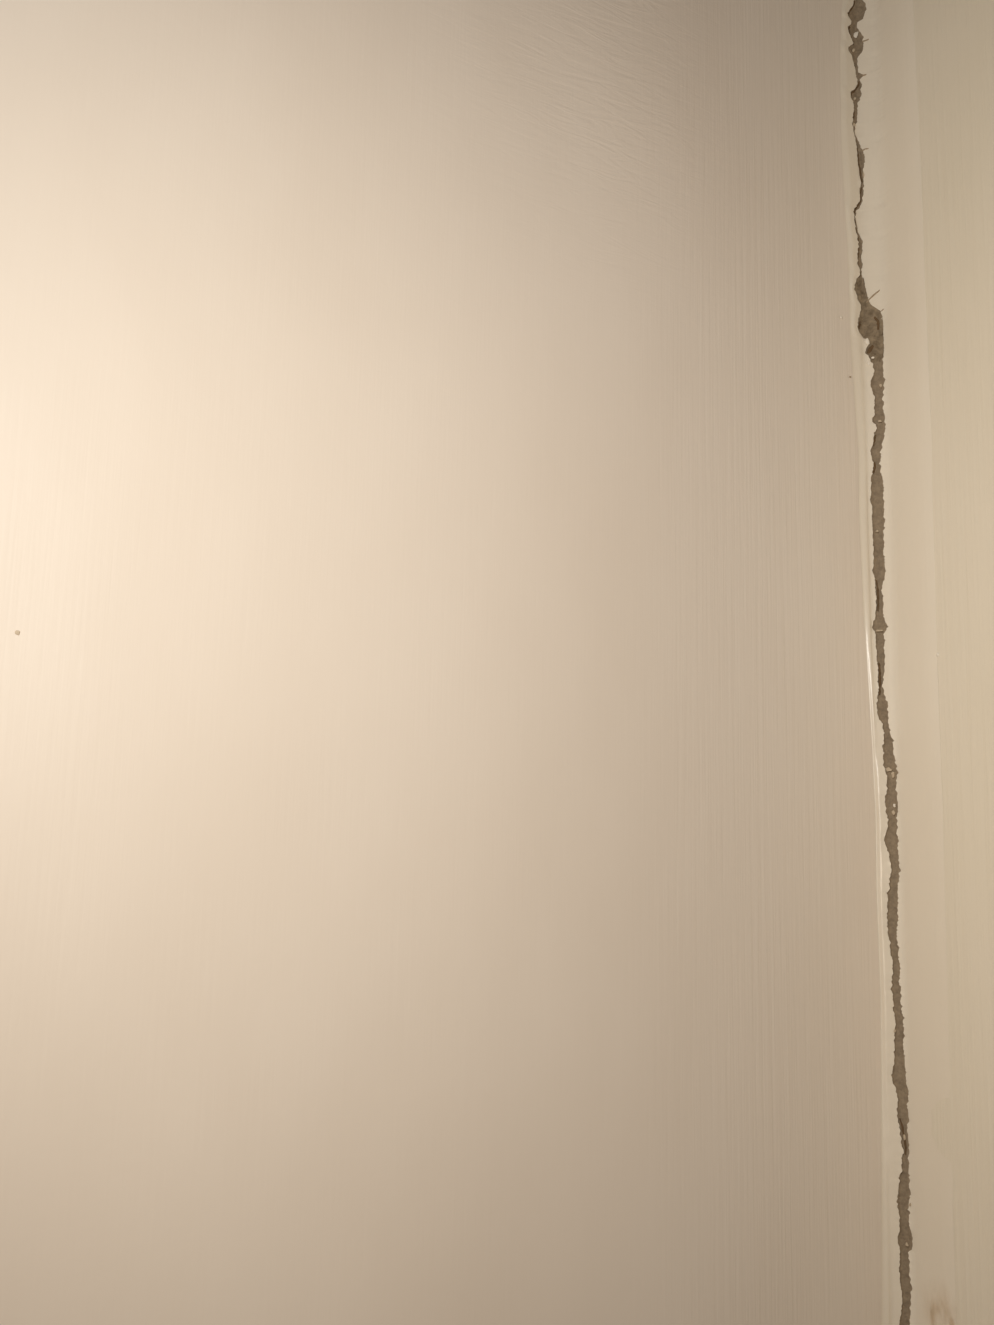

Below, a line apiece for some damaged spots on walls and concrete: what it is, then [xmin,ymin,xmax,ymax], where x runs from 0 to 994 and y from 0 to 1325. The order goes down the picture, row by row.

crack [848,0,913,1325]